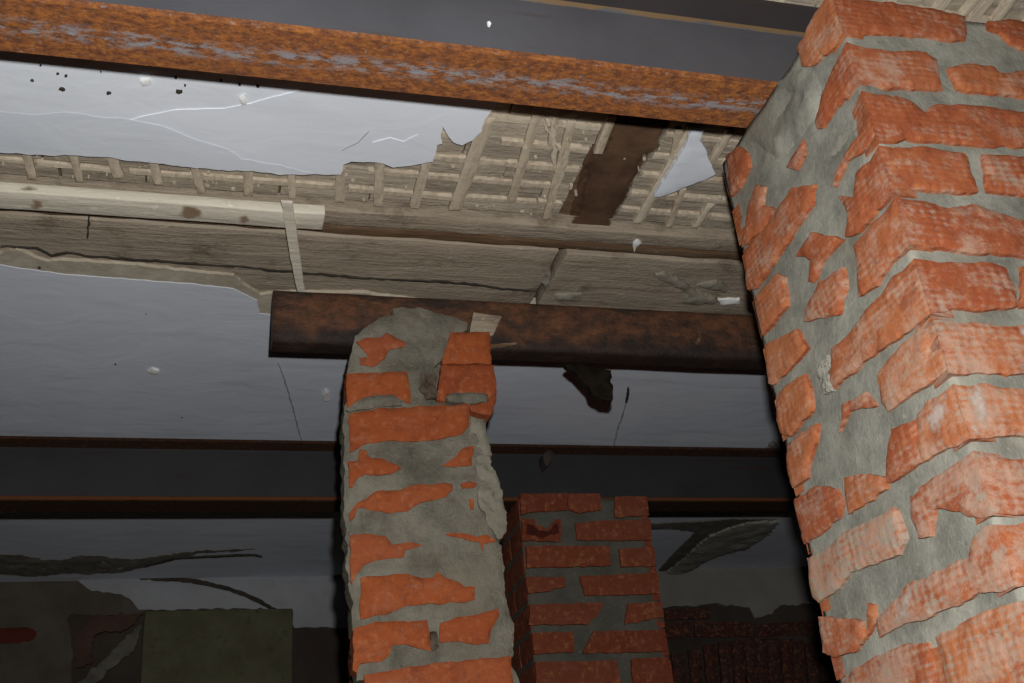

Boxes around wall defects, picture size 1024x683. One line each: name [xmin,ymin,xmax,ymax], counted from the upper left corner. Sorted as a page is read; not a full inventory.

crack [121,90,300,124]
peeling [0,112,313,174]
crack [341,131,418,151]
peeling [654,128,715,197]
spalling [816,355,836,394]
flaking render [0,548,262,577]